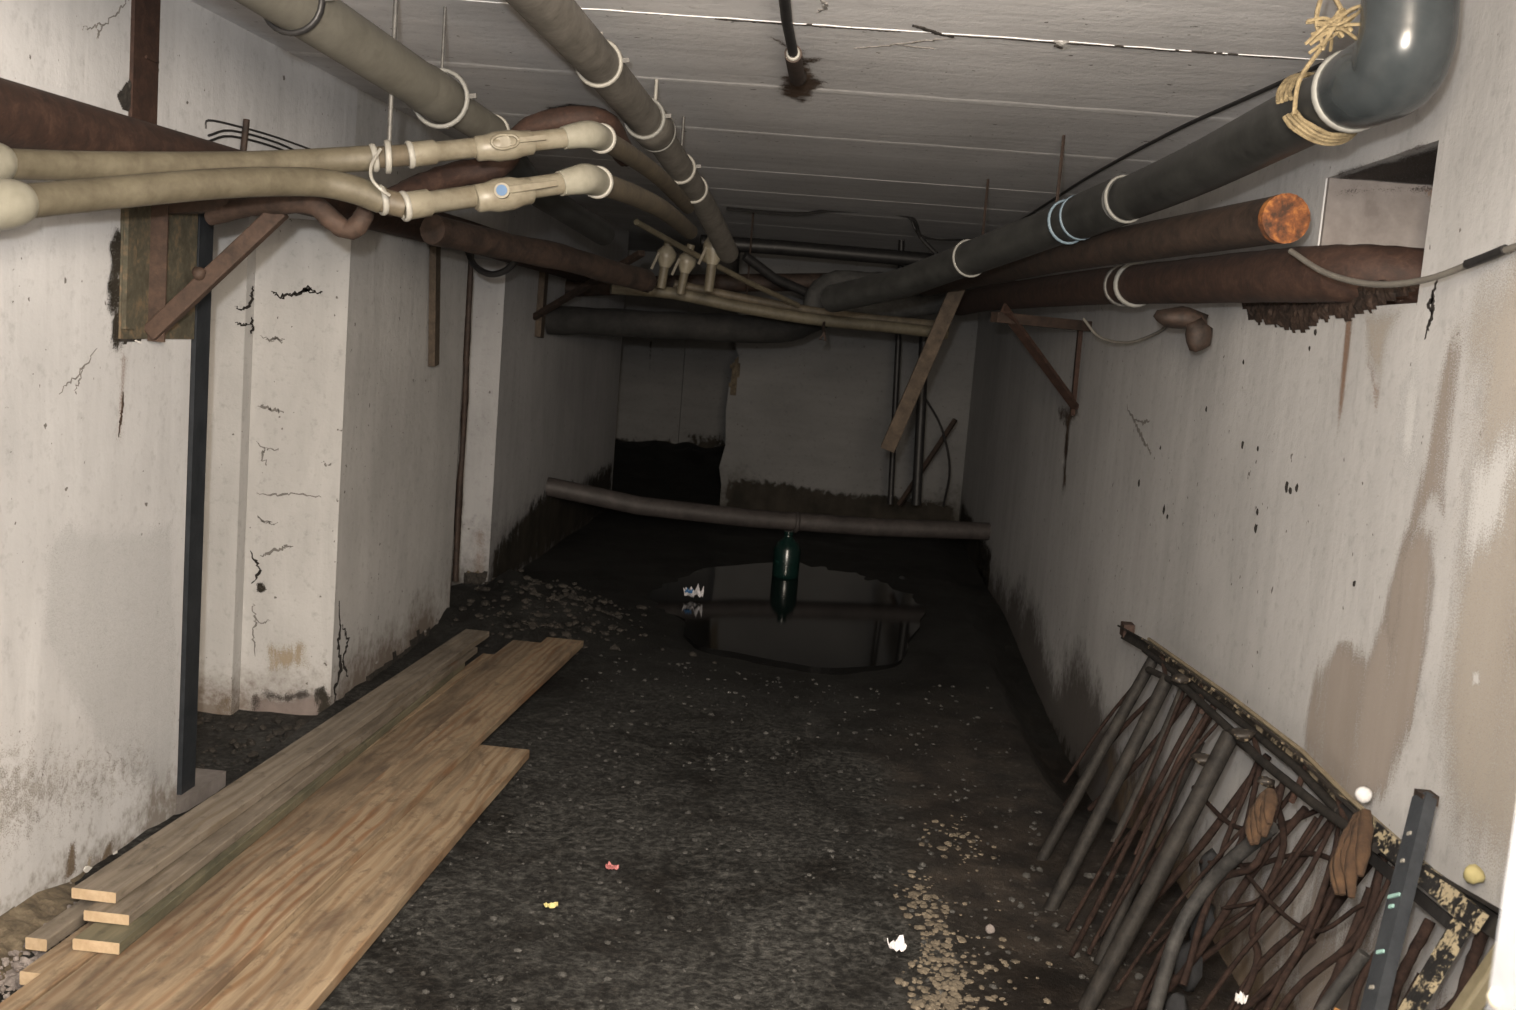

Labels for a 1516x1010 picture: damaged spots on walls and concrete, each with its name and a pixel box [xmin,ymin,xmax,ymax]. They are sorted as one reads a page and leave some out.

crack [235,285,323,344]
crack [1424,280,1438,340]
crack [59,348,97,394]
crack [250,404,321,654]
water stain [1302,226,1516,899]
crack [333,601,350,702]
water stain [1171,818,1386,1010]